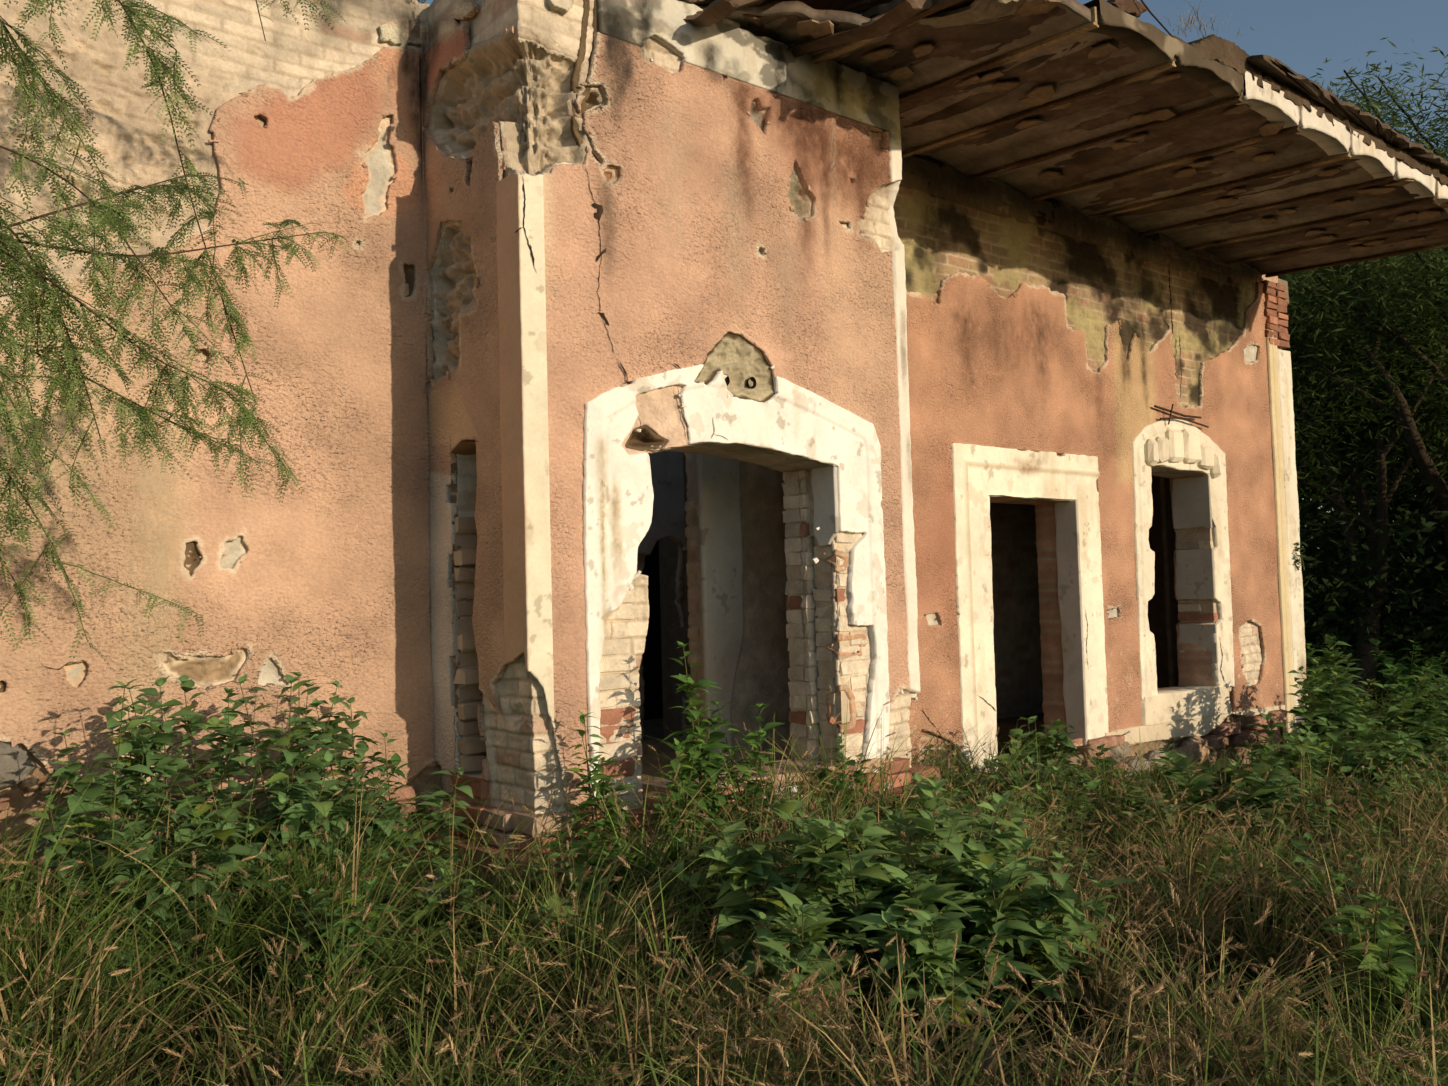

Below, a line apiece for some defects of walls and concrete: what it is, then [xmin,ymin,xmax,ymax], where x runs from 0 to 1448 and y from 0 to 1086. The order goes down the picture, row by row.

flaking render [0,0,430,301]
spalling [427,25,621,184]
crack [570,0,628,384]
damp [608,1,650,101]
flaking render [788,165,812,222]
flaking render [837,0,1448,408]
flaking render [404,217,480,387]
flaking render [622,332,775,455]
crack [674,363,728,441]
flaking render [183,541,201,576]
flaking render [157,644,287,689]
flaking render [1239,620,1262,688]